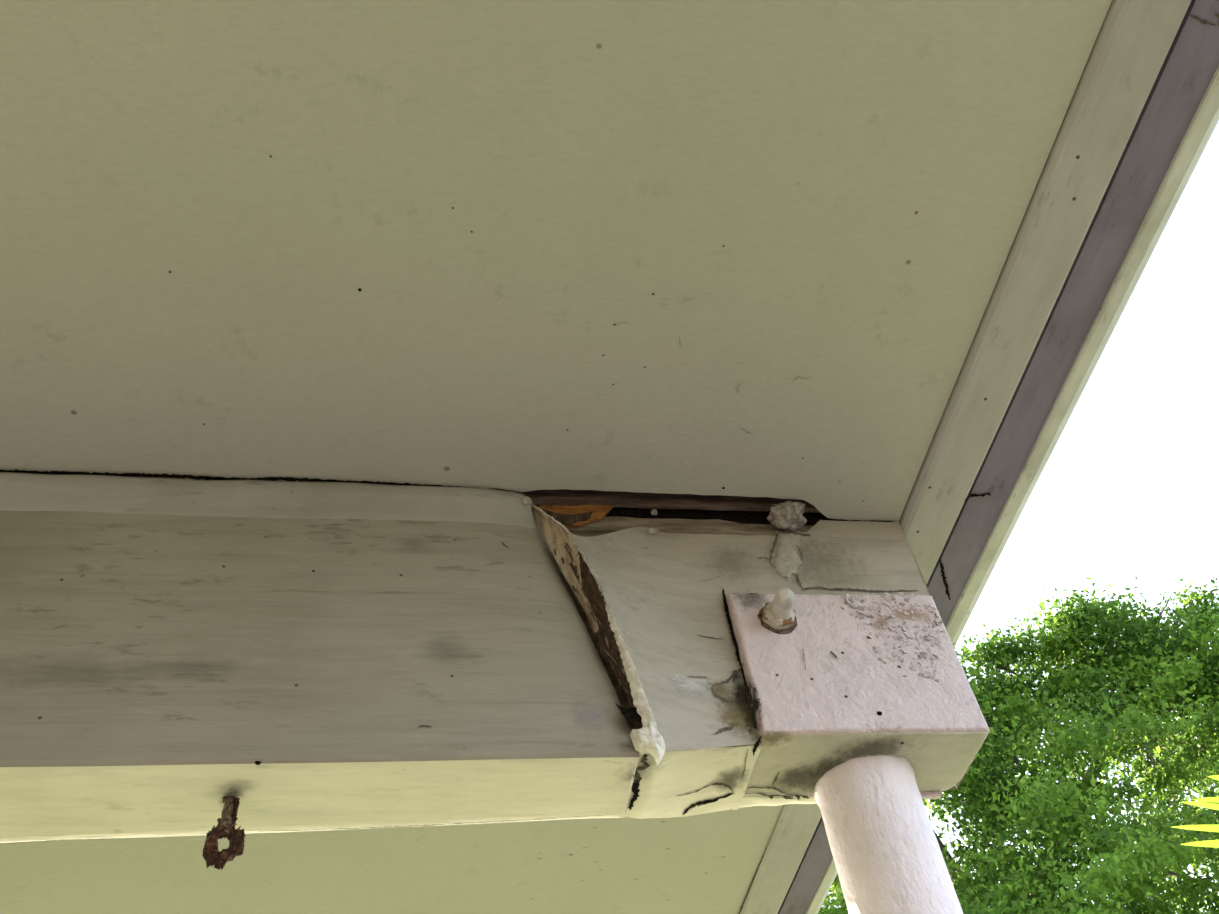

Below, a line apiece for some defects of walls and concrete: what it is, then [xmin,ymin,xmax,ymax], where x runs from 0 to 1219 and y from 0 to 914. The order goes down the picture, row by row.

crack [0,469,520,492]
peeling [840,592,945,682]
crack [678,574,810,815]
damp [727,675,761,731]
damp [780,741,896,790]
corrosion [202,796,246,870]